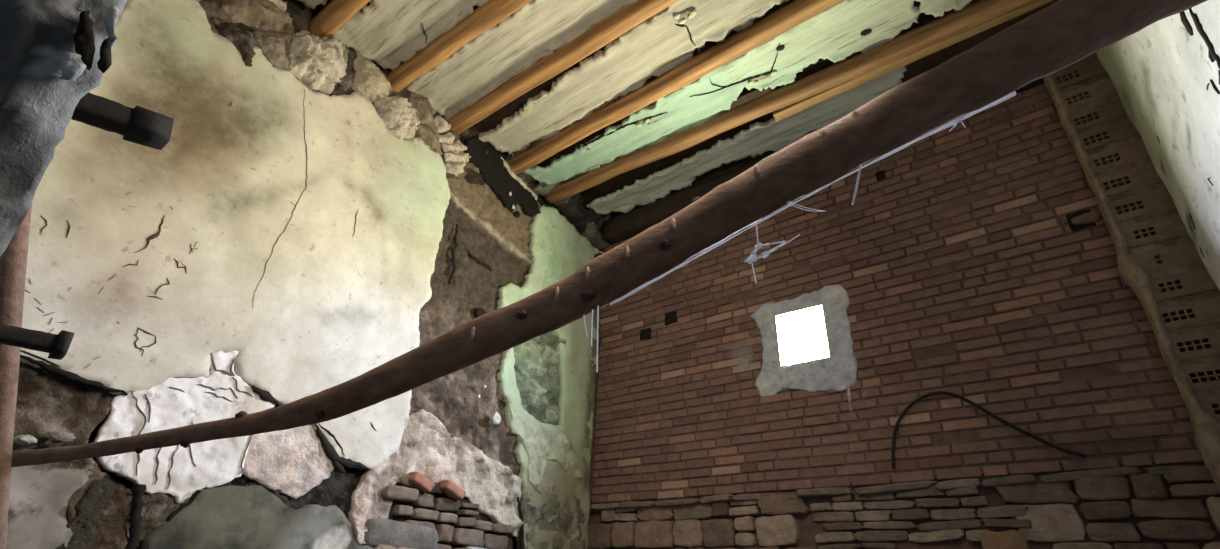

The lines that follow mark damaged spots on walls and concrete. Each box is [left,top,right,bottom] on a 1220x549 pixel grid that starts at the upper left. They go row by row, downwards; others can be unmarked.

crack [253,89,308,300]
spalling [197,0,613,346]
peeling [673,9,697,24]
peeling [748,71,777,86]
crack [1179,8,1220,94]
peeling [12,332,586,549]